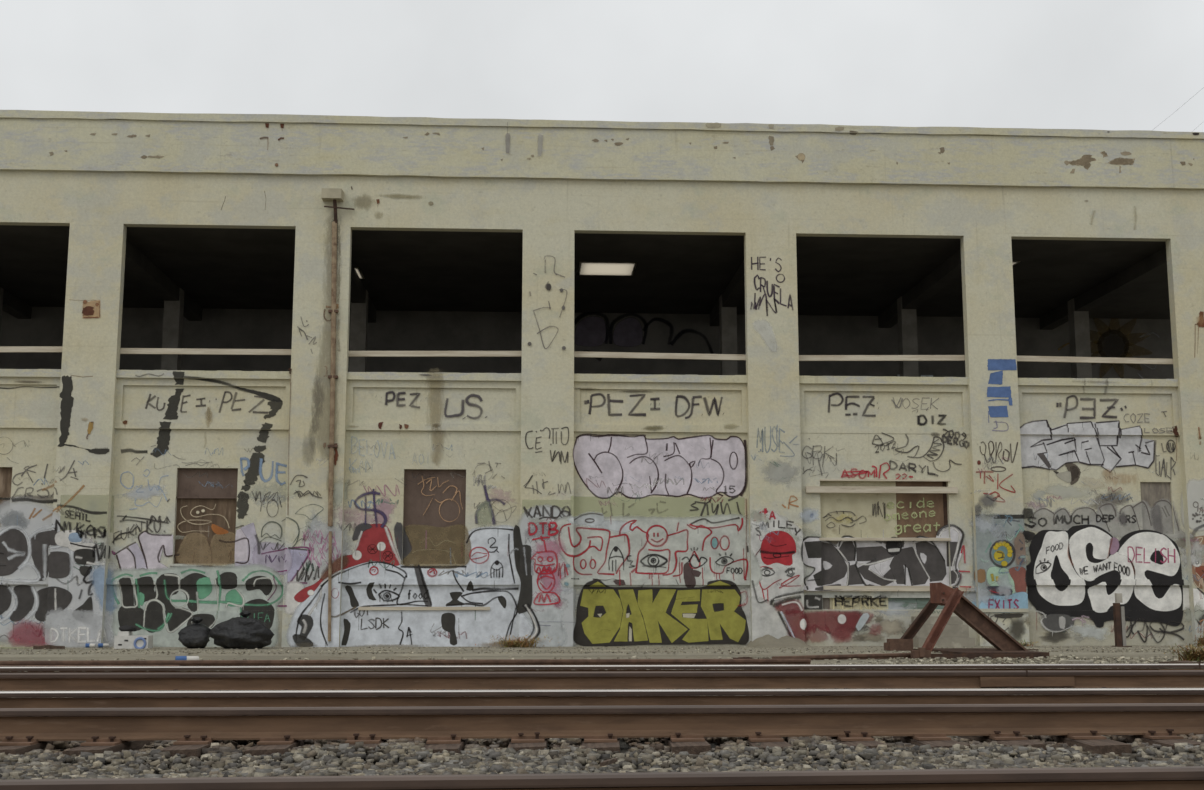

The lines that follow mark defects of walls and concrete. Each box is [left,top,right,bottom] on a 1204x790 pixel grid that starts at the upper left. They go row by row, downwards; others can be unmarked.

spalling [1065,151,1135,173]